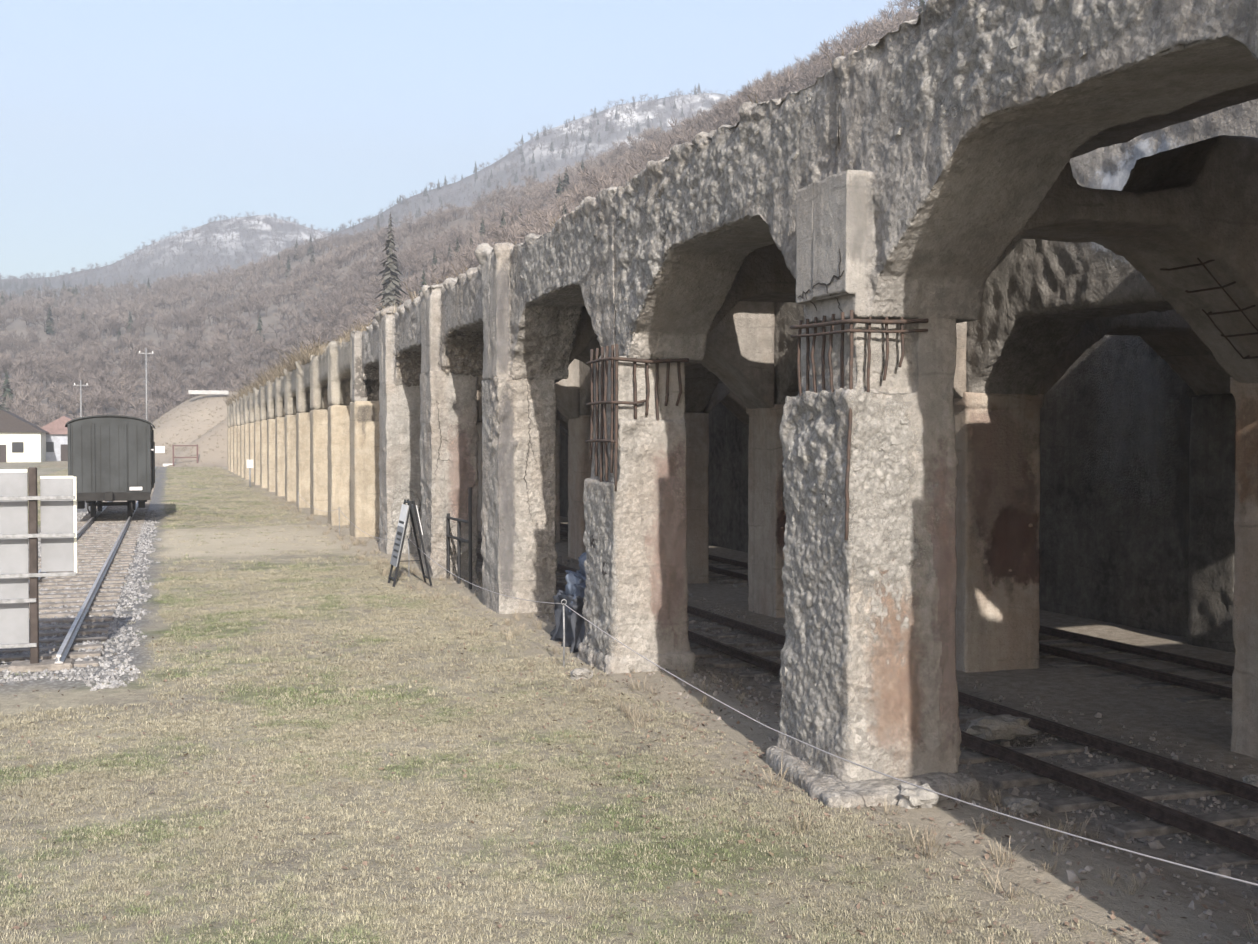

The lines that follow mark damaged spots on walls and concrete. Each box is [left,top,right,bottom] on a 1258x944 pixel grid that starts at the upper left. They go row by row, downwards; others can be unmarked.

spalling [520,97,811,657]
crack [797,249,844,312]
spalling [777,310,929,786]
spalling [1160,258,1258,359]